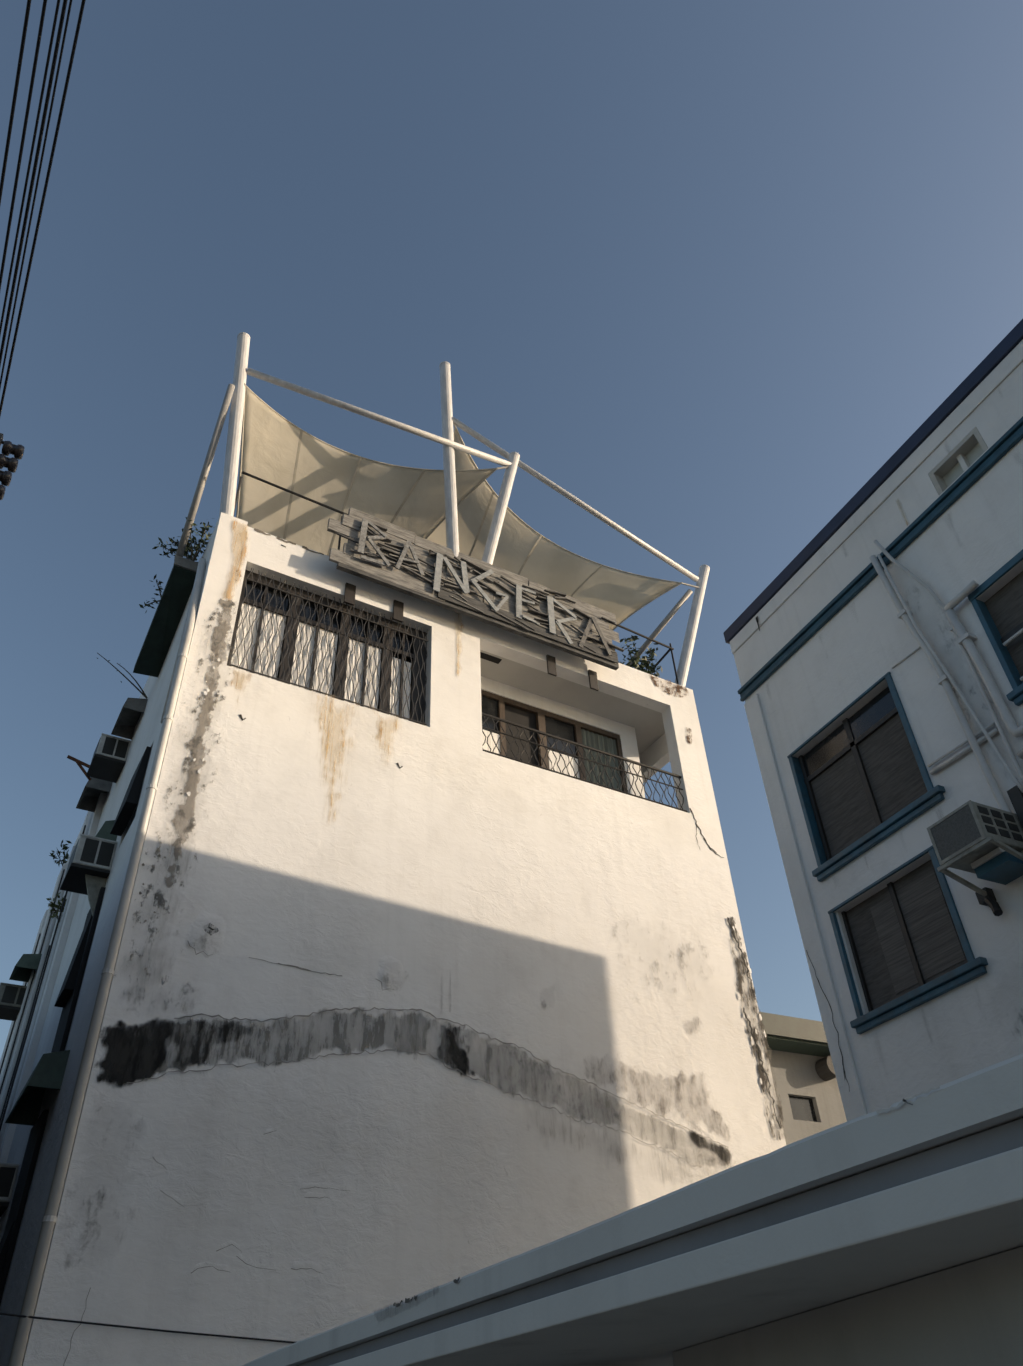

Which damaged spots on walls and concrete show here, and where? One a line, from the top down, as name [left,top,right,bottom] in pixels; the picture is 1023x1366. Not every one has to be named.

crack [689,808,724,858]
crack [249,957,342,976]
water stain [98,1007,730,1168]